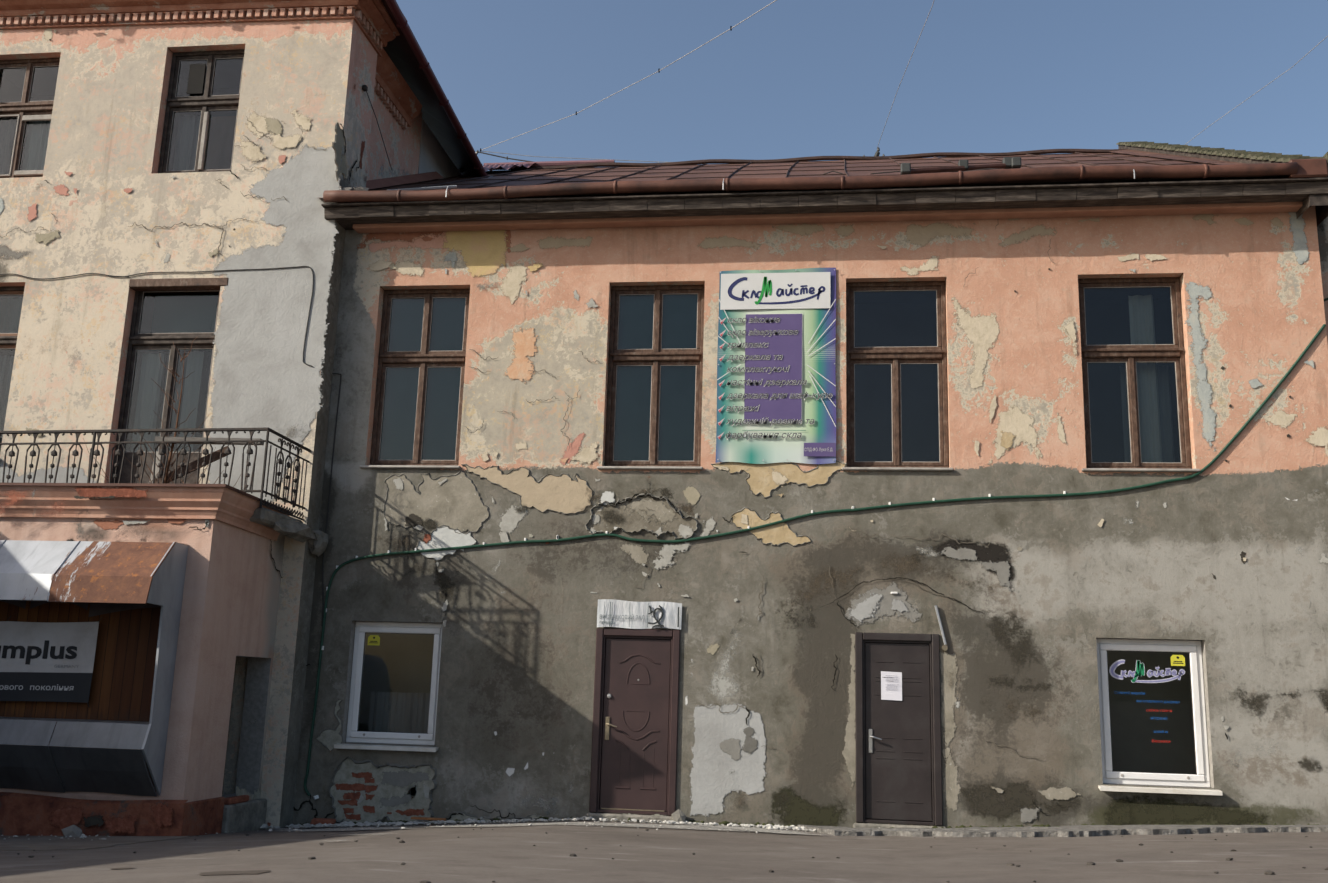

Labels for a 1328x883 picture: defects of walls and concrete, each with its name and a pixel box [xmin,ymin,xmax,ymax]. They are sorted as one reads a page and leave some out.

peeling [241,109,311,164]
peeling [477,230,593,305]
peeling [952,297,1043,466]
peeling [1184,281,1232,462]
flaking render [384,442,599,573]
flaking render [620,460,846,588]
damp [992,615,1034,665]
flaking render [310,699,545,826]
peeling [719,738,741,760]
damp [962,781,1081,823]